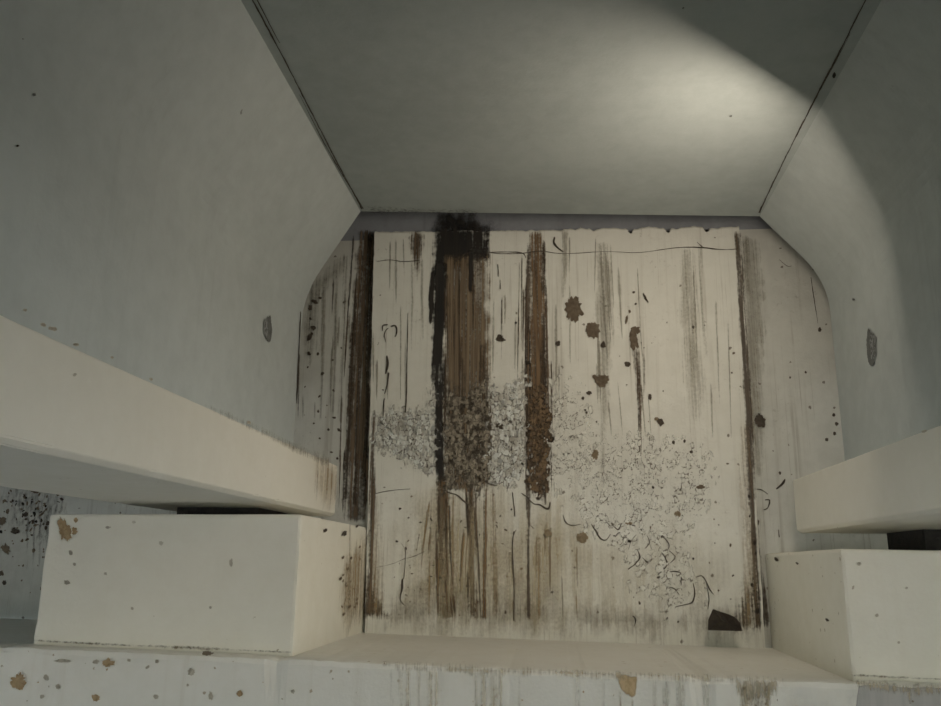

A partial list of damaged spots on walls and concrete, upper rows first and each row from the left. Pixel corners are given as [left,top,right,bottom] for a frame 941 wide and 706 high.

corrosion [317,230,374,521]
corrosion [422,254,498,619]
corrosion [524,232,553,619]
peeling [370,361,717,620]
water stain [734,234,769,626]